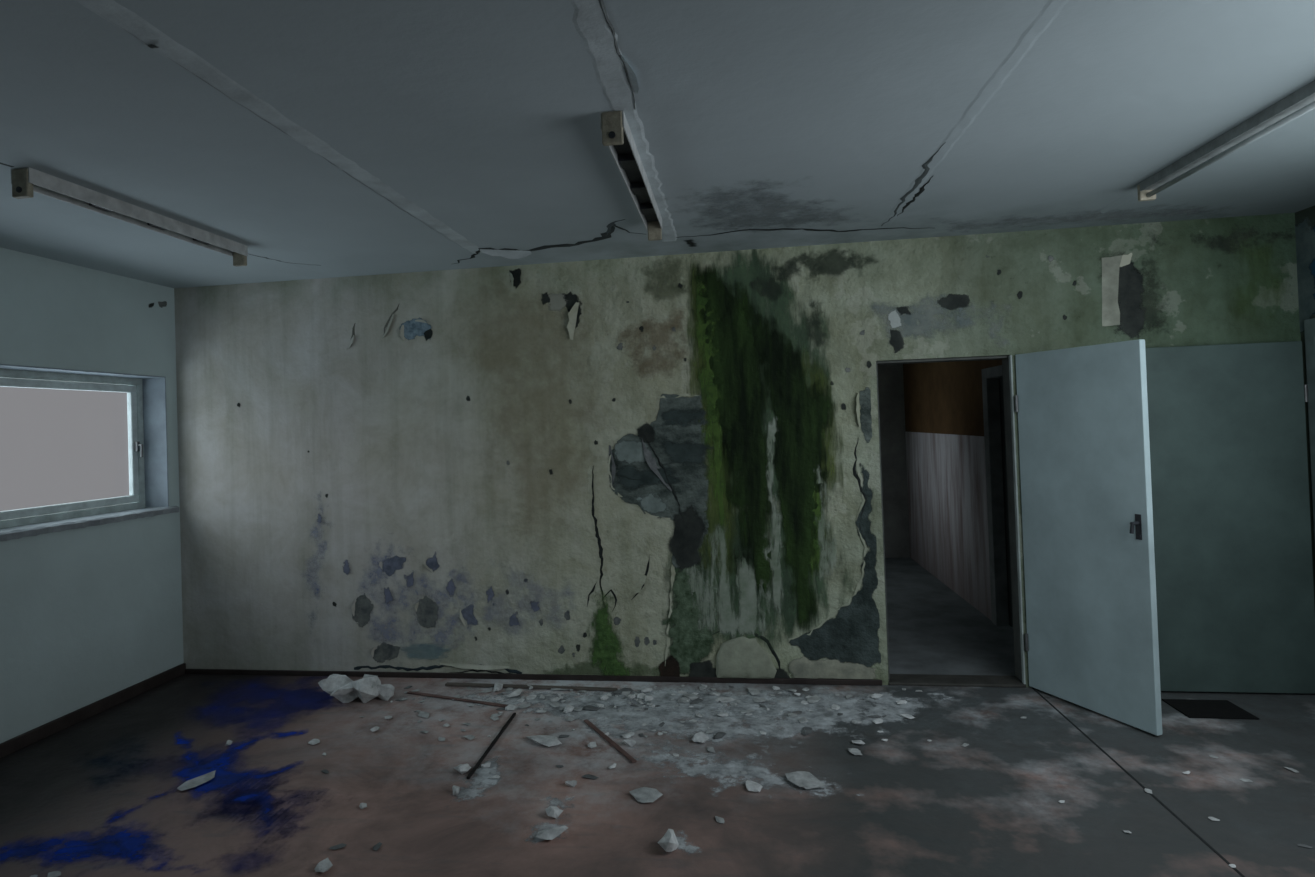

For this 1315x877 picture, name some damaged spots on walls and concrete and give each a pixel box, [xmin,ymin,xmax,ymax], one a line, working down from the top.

crack [599,0,639,105]
crack [124,29,641,264]
peeling [382,305,433,341]
leakage [645,250,874,628]
peeling [333,594,373,627]
peeling [379,555,406,576]
peeling [415,596,439,628]
peeling [424,552,439,573]
peeling [354,643,522,674]
crack [587,465,617,610]
spalling [594,392,717,677]
spalling [774,387,881,679]